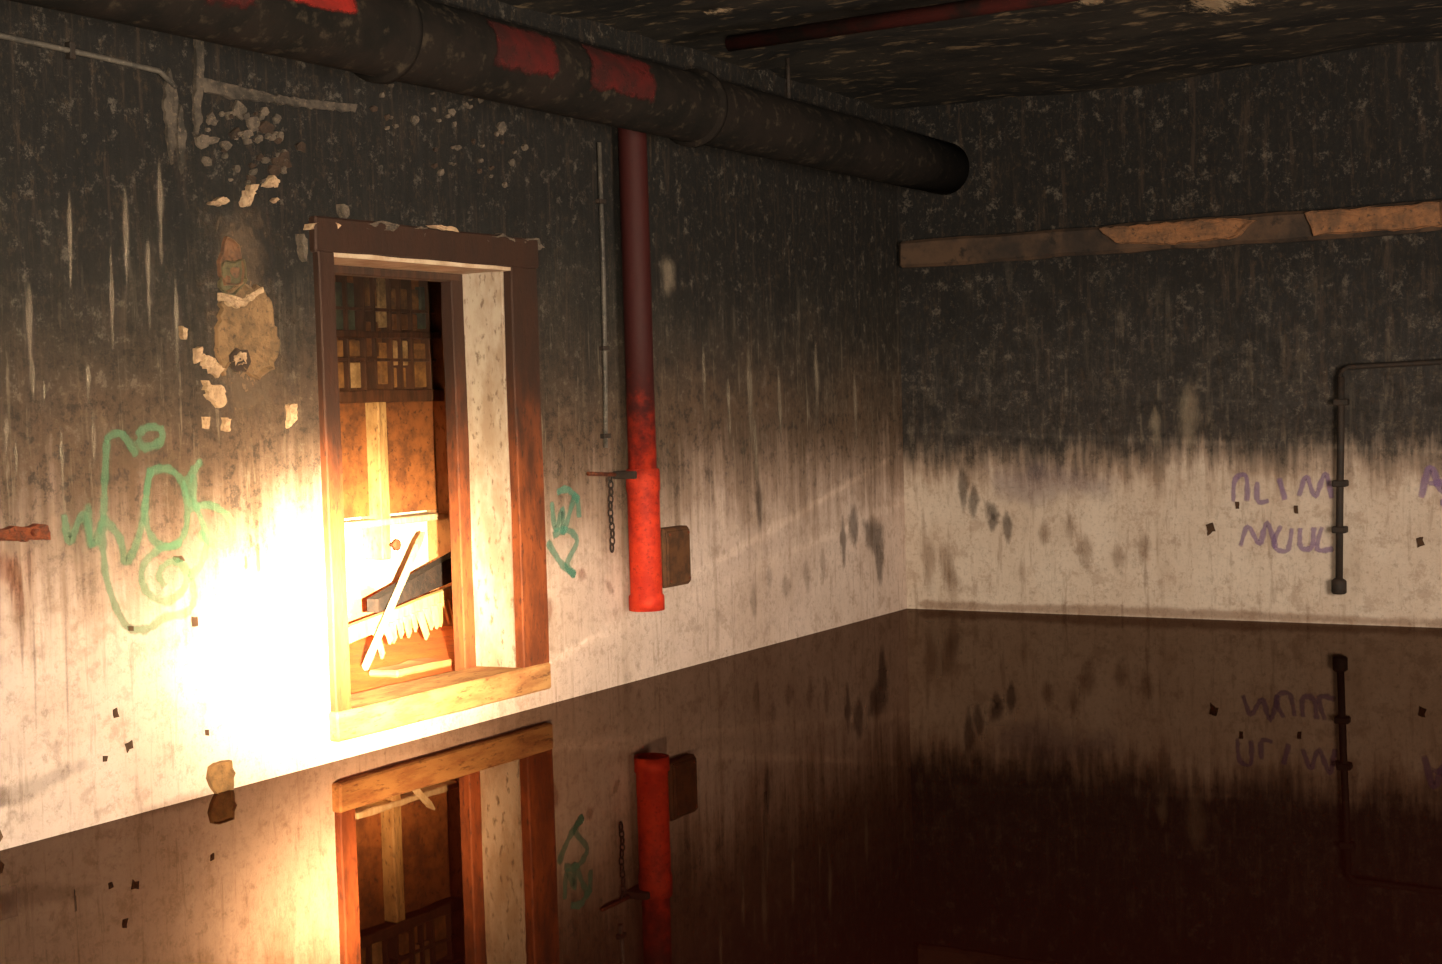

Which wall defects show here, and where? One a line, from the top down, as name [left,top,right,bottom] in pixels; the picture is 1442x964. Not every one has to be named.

peeling [431,121,529,188]
flaking render [161,39,484,437]
peeling [488,233,545,250]